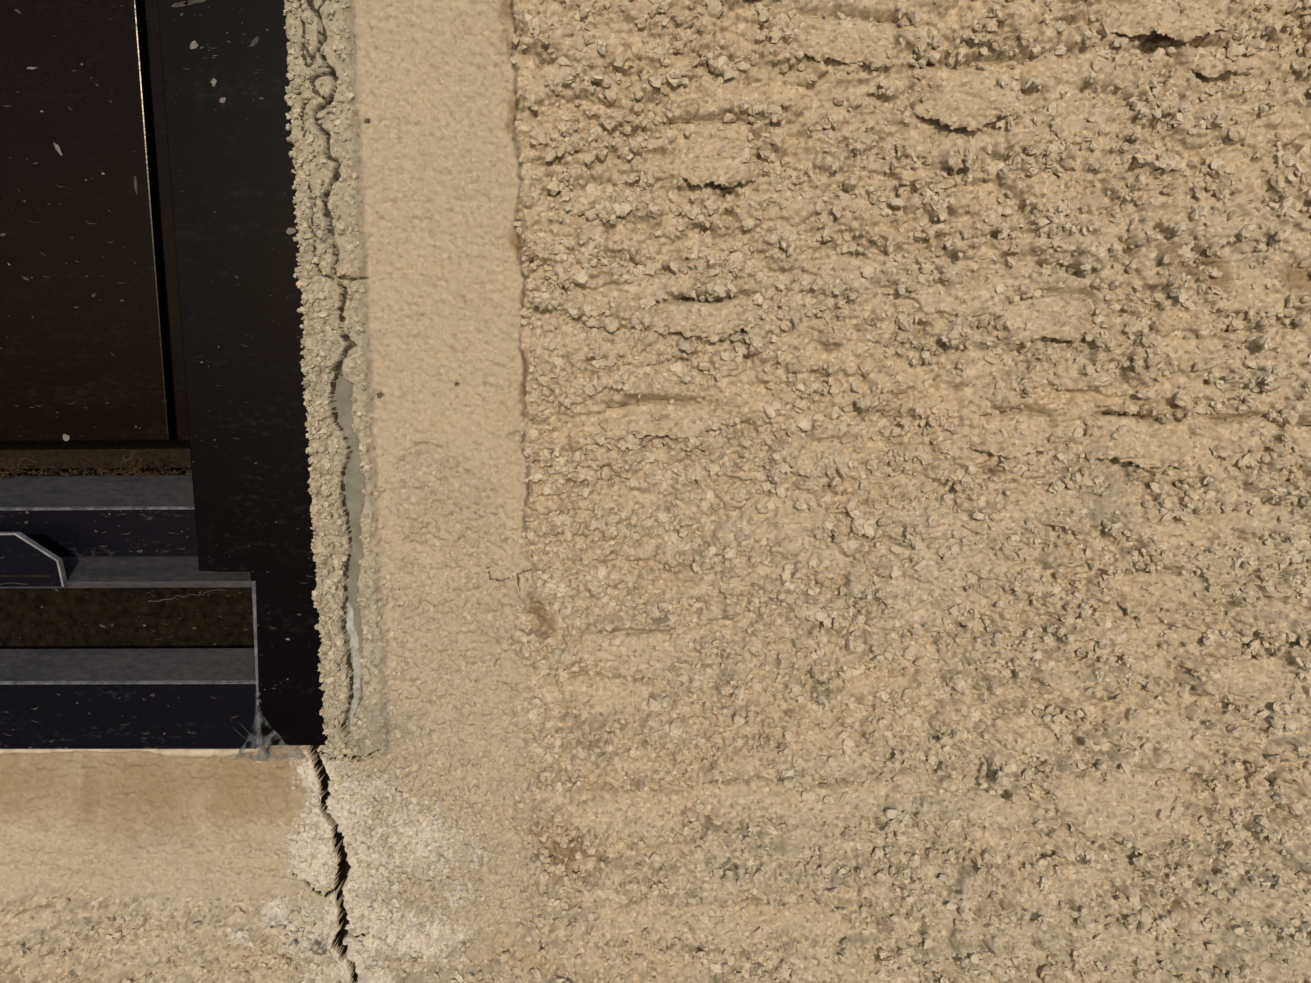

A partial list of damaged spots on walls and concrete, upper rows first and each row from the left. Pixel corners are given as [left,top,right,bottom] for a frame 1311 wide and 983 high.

crack [292,0,381,983]